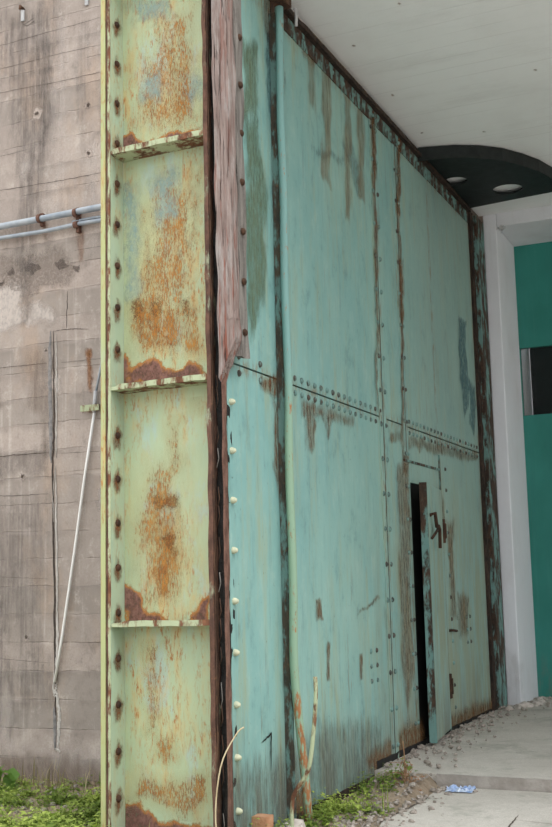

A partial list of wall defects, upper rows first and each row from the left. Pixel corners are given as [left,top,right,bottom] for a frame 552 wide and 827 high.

corrosion [114,13,198,148]
corrosion [345,113,377,215]
corrosion [114,177,206,383]
corrosion [303,404,353,447]
corrosion [115,427,190,623]
corrosion [190,595,209,620]
corrosion [397,438,477,704]
corrosion [115,773,209,827]